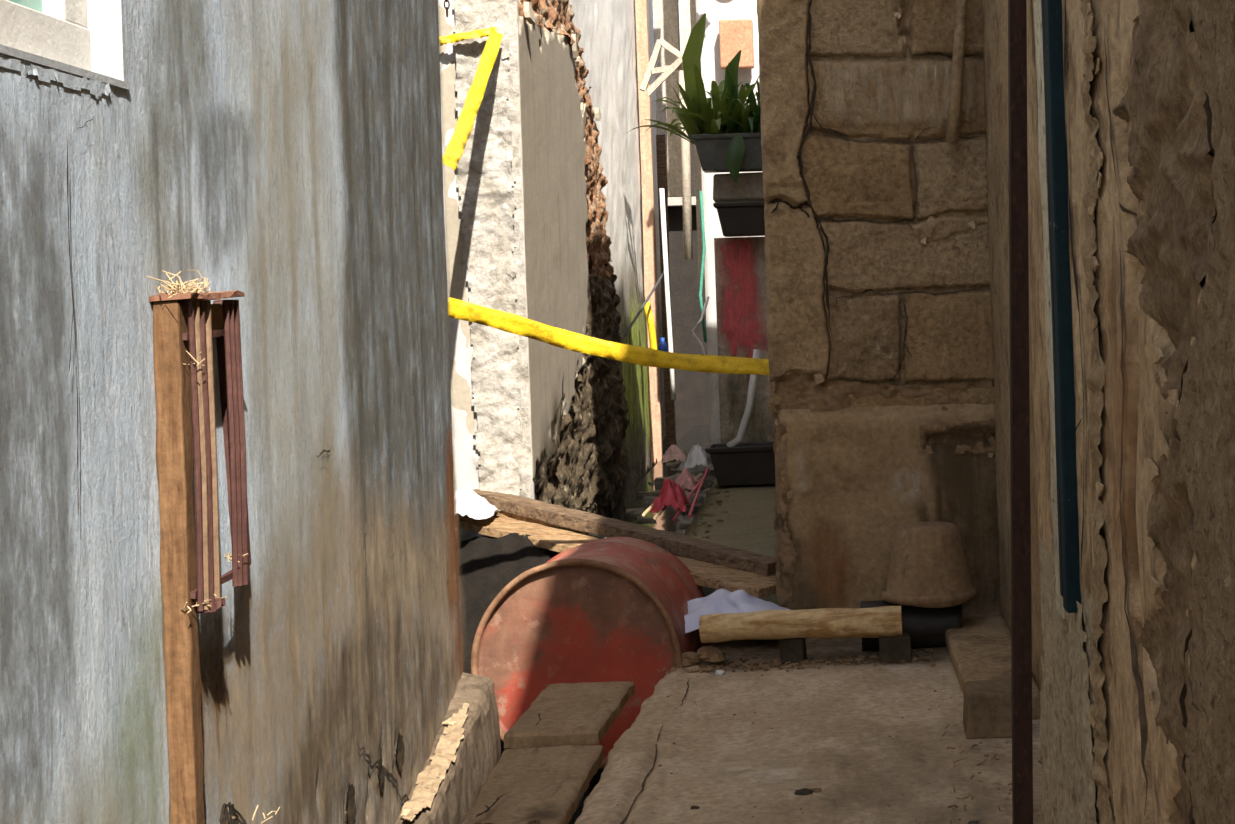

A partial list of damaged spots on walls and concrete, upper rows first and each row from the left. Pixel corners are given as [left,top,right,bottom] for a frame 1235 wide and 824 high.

peeling [0,53,111,99]
damp [186,107,250,254]
flaking render [452,0,613,314]
crack [767,0,990,383]
damp [0,132,66,824]
damp [200,0,462,824]
flaking render [470,322,523,496]
flaking render [1039,0,1114,824]
flaking render [1110,0,1216,824]
crack [620,681,697,824]